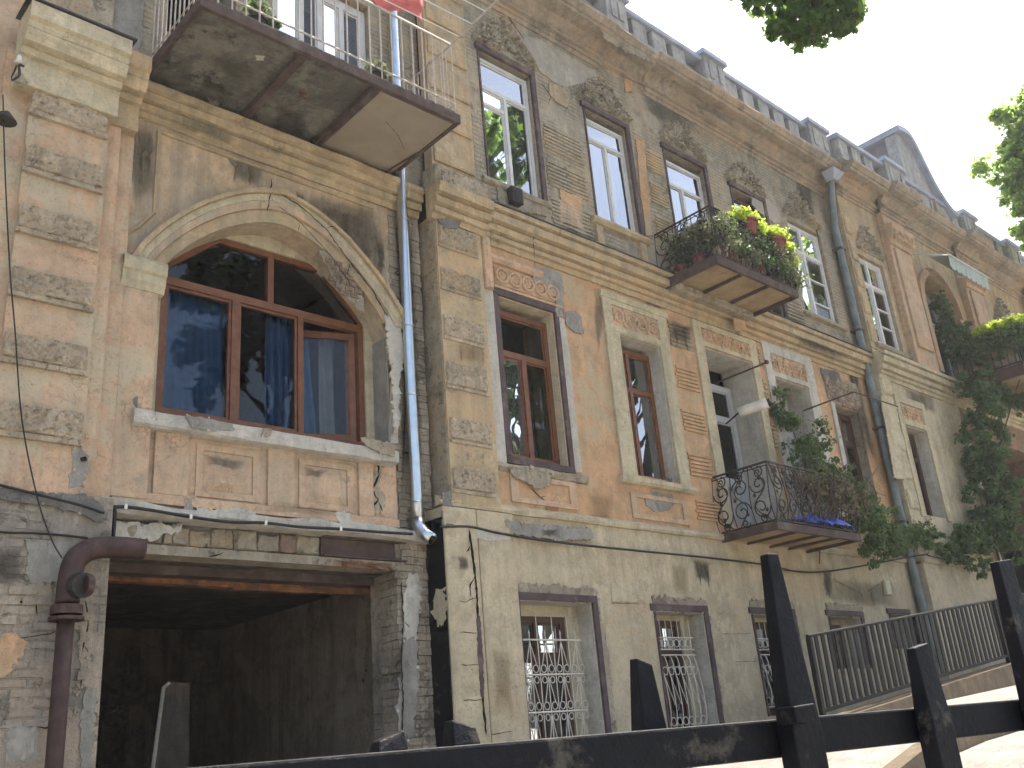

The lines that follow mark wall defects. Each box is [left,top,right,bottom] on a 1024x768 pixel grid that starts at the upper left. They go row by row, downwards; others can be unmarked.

water stain [134,142,152,188]
crack [267,179,388,317]
flaking render [318,250,365,313]
flaking render [531,266,583,326]
flaking render [335,311,404,525]
flaking render [68,446,99,501]
crack [373,465,383,511]
flaking render [111,519,319,556]
crack [461,529,479,633]
flaking render [0,581,55,678]
peeling [394,560,448,742]
crack [464,696,511,735]